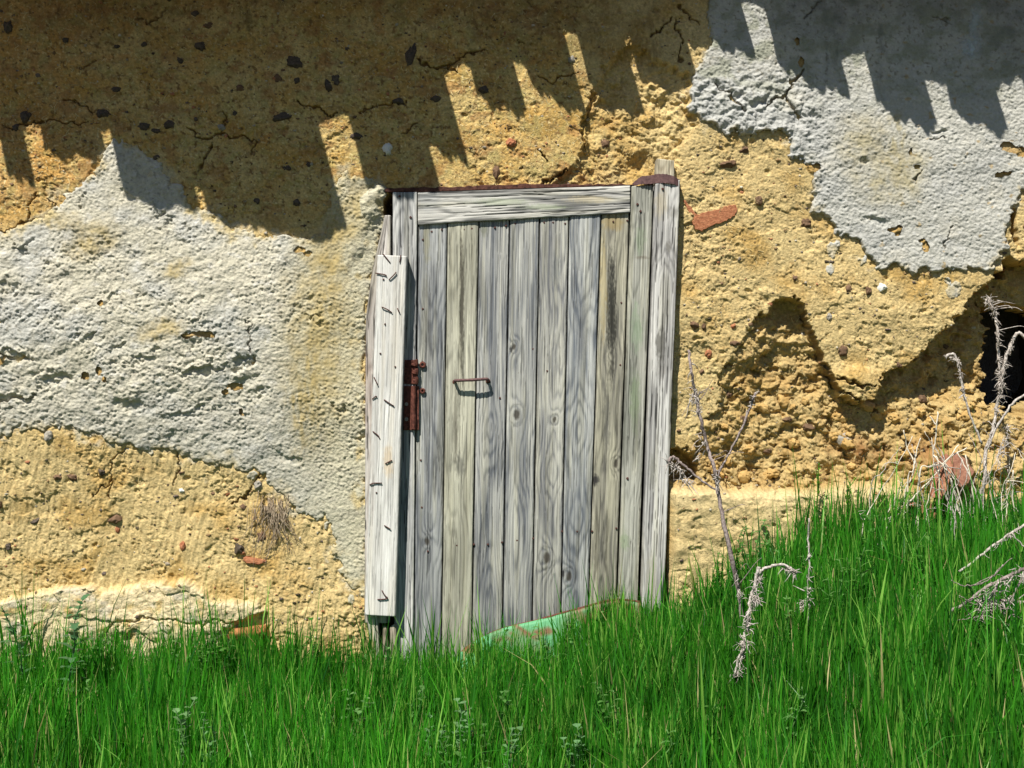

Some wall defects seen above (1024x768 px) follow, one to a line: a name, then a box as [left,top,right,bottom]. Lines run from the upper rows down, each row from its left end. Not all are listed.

crack [650,4,700,63]
crack [2,99,98,130]
crack [186,112,258,173]
crack [296,99,418,134]
crack [715,68,805,121]
flaking render [552,0,1024,497]
flaking render [0,138,387,660]